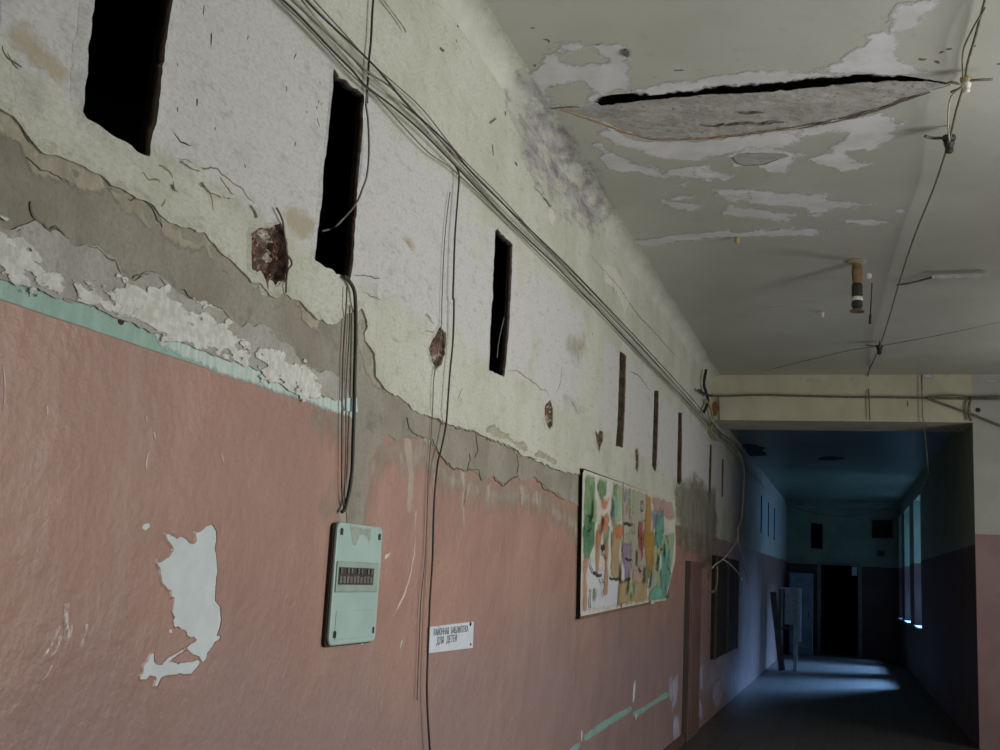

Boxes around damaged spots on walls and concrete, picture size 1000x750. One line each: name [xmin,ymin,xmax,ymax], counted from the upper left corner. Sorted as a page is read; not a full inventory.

damp [521,80,616,225]
spalling [530,0,961,246]
flaking render [0,95,581,549]
peeling [138,522,223,690]